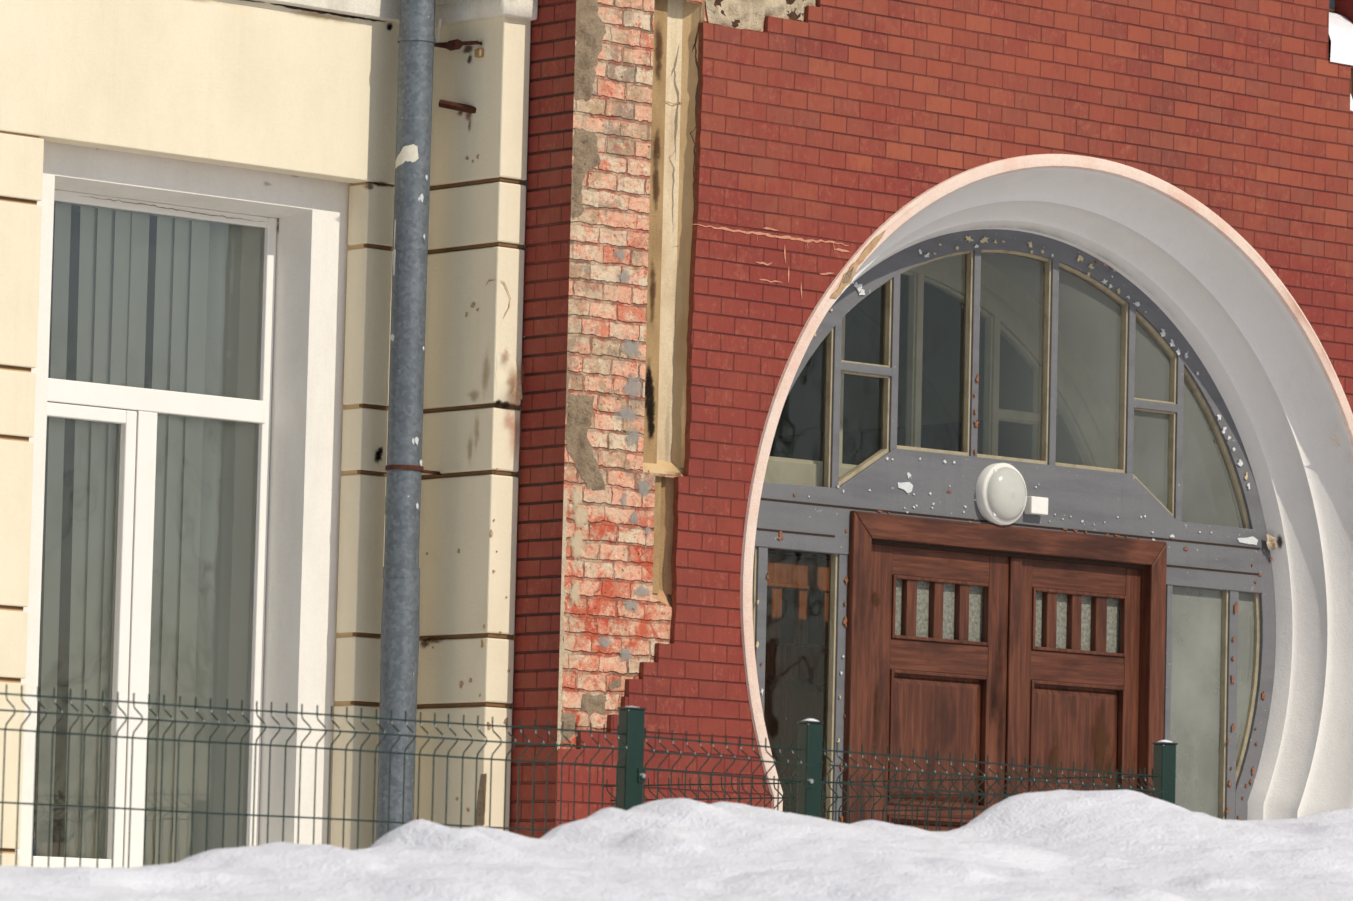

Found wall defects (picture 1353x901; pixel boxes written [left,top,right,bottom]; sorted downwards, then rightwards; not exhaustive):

crack [245,0,385,22]
spalling [682,0,816,32]
crack [665,21,850,297]
spalling [555,0,678,828]
peeling [878,472,935,514]